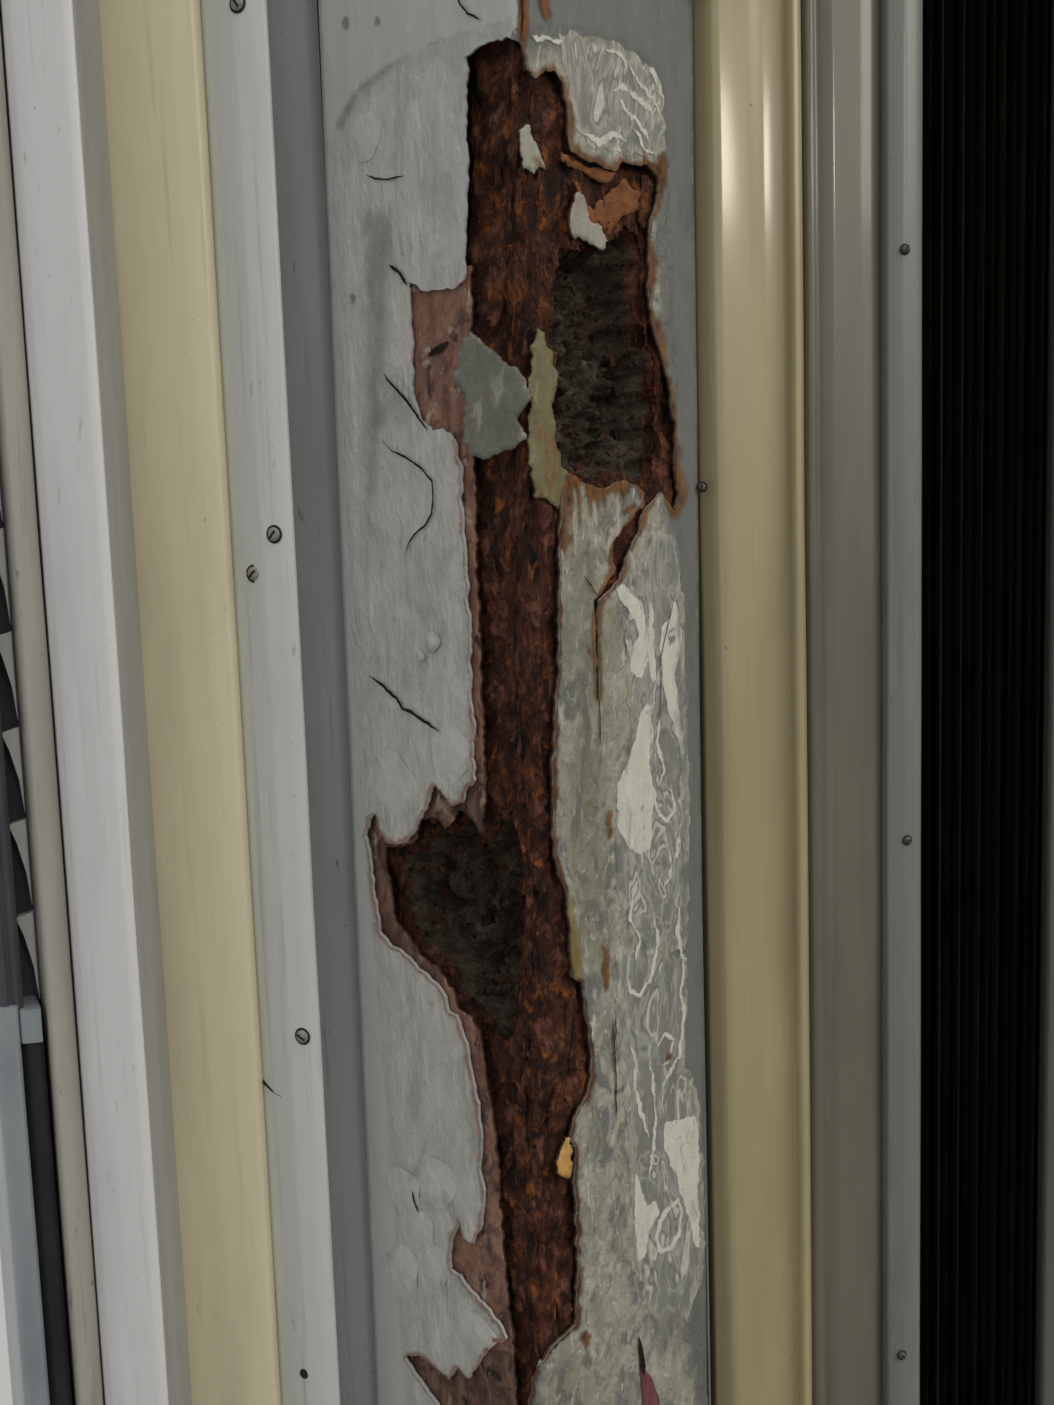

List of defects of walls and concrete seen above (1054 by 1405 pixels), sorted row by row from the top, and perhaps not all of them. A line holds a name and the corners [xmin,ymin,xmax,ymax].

peeling [532,30,667,158]
peeling [567,191,608,251]
crack [383,373,428,431]
crack [381,440,433,557]
crack [368,675,441,733]
rust [363,0,687,1405]
peeling [368,265,519,1405]
peeling [615,531,706,1323]
peeling [639,1337,660,1405]